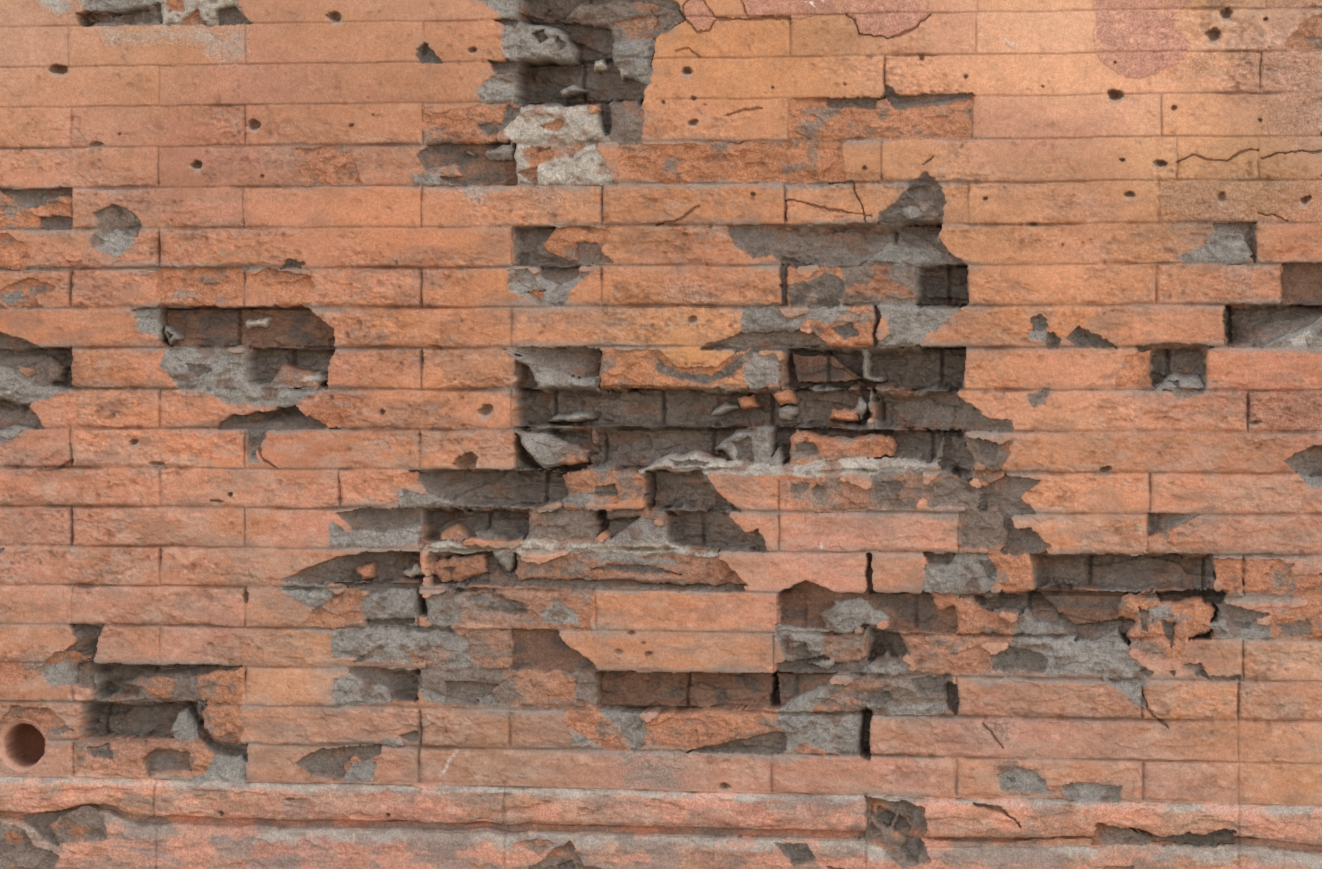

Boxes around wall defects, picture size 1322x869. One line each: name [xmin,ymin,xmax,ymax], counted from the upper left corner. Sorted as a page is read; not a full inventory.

spalling [77,0,254,28]
spalling [325,12,346,27]
crack [846,14,932,39]
spalling [412,0,976,197]
crack [1179,149,1322,162]
spalling [0,188,73,310]
spalling [0,333,74,444]
spalling [133,259,357,464]
spalling [274,172,1322,761]
spalling [2,624,248,785]
spalling [513,839,599,869]
spalling [864,796,931,869]